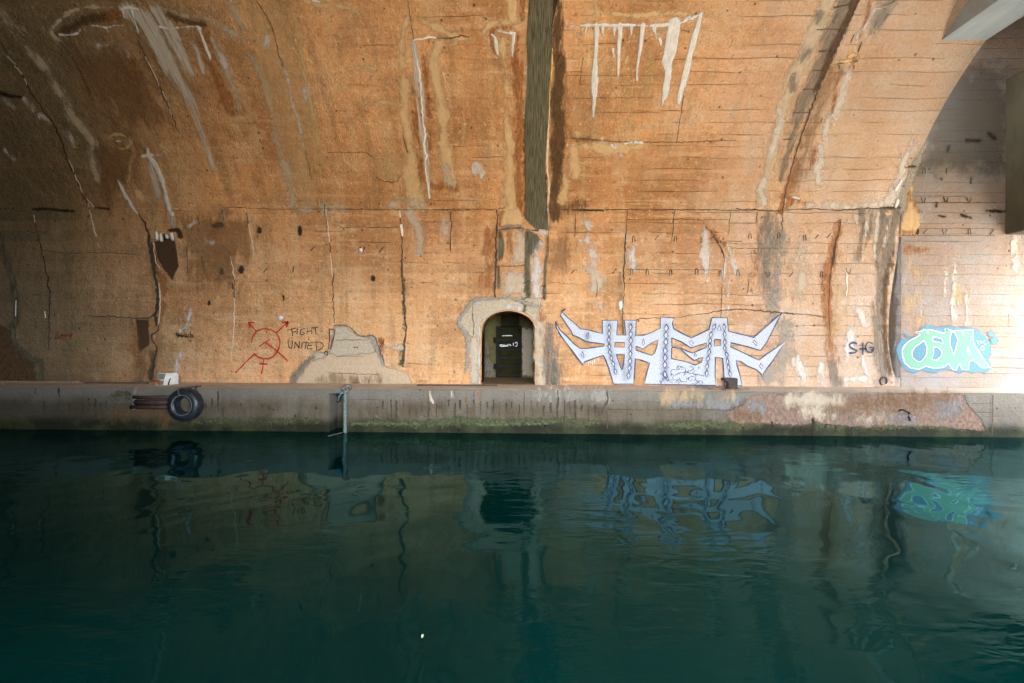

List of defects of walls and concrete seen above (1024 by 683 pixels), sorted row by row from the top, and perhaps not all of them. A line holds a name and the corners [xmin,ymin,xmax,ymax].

leakage [0,91,50,125]
crack [0,42,167,381]
leakage [25,46,200,229]
leakage [49,0,243,172]
spalling [290,324,411,384]
crack [227,199,526,367]
spalling [457,296,542,384]
leakage [482,0,738,385]
crack [558,0,996,332]
leakage [754,0,882,386]
rust [822,220,842,387]